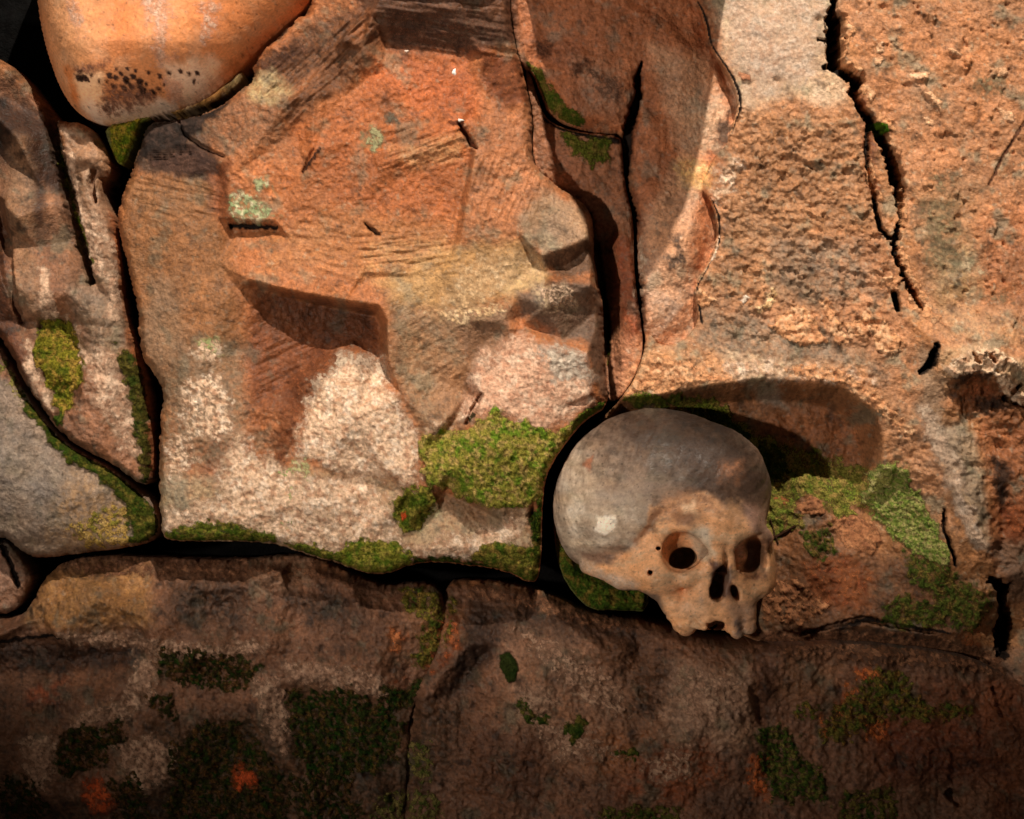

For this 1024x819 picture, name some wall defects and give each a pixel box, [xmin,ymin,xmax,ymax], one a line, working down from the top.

crack [817,0,916,312]
crack [918,342,941,375]